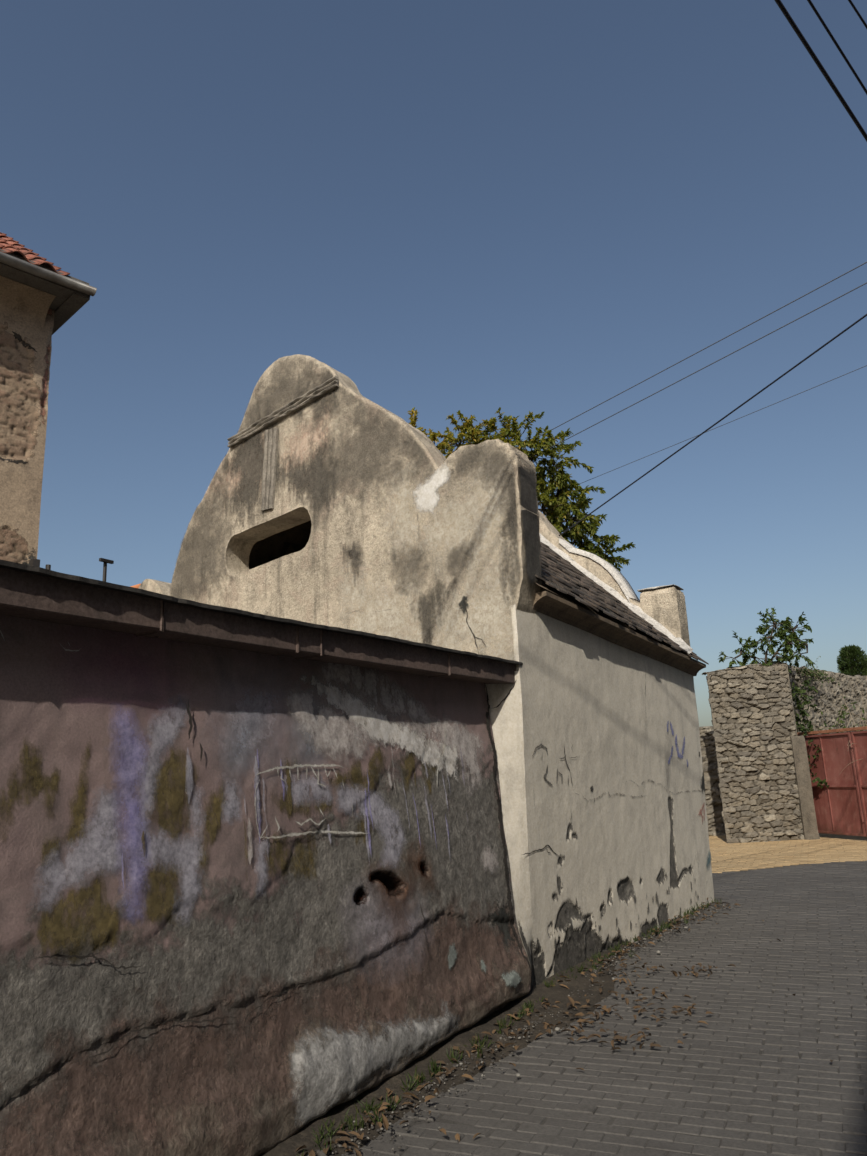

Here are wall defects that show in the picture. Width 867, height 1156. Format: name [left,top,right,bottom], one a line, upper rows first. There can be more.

water stain [171,365,428,599]
water stain [458,446,542,586]
water stain [419,585,443,645]
crack [464,600,485,654]
crack [485,681,558,976]
crack [32,953,140,970]
flaking render [0,744,699,1156]